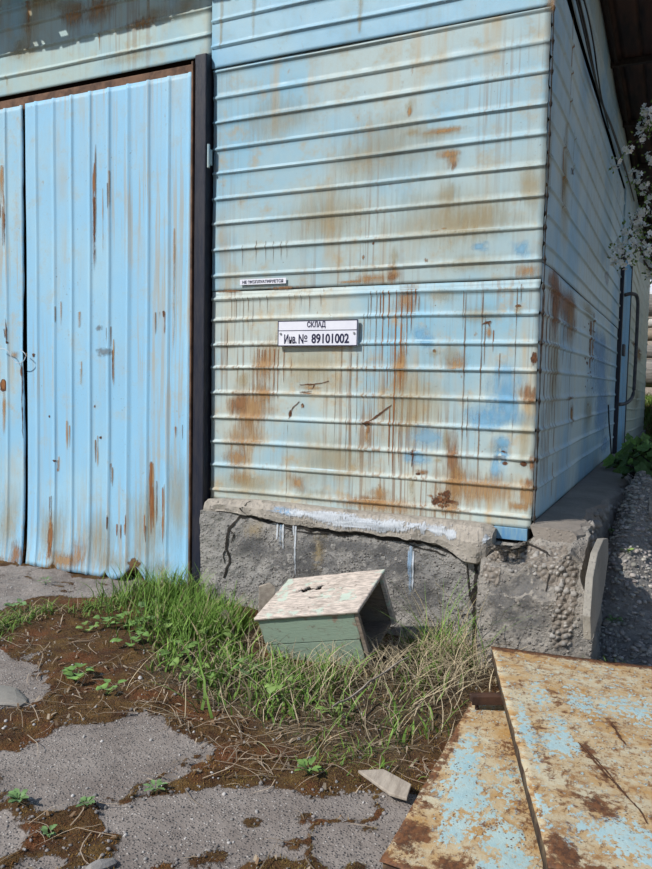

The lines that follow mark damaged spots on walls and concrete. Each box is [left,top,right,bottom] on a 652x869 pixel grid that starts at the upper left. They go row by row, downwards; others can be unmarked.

rust [92,150,110,258]
rust [230,349,292,482]
rust [335,266,419,468]
rust [479,297,494,389]
rust [513,274,577,486]
rust [48,497,83,566]
rust [144,462,165,541]
damp [346,498,405,512]
crack [223,501,551,639]
rust [429,441,460,513]
damp [446,473,507,500]
spalling [483,538,579,649]